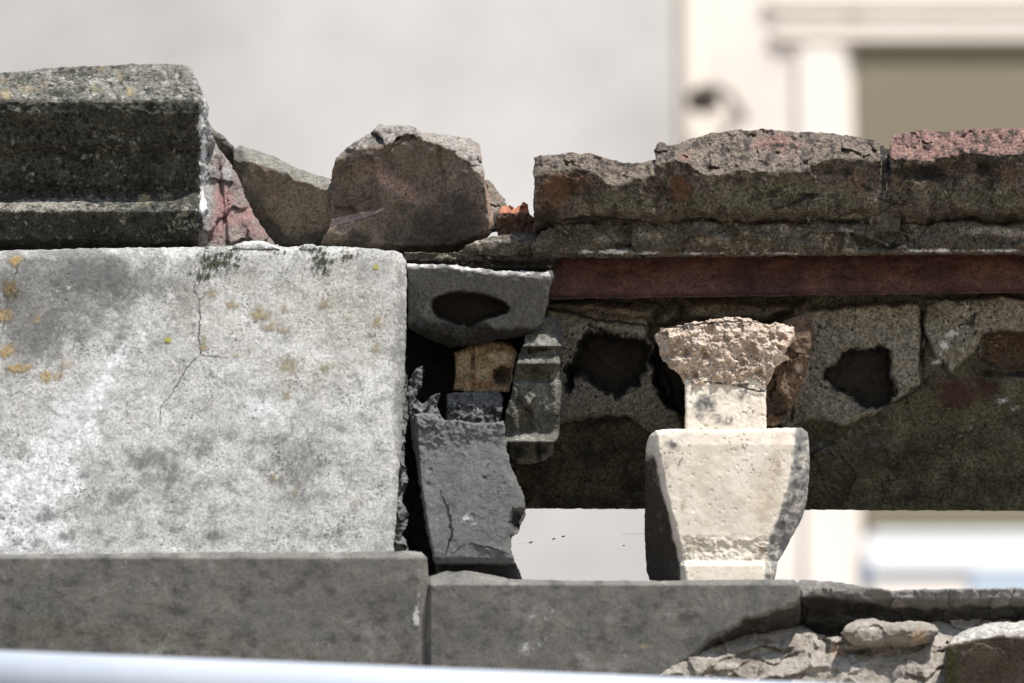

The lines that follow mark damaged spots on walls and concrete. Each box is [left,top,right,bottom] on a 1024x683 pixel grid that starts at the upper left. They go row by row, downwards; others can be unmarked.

crack [159,280,219,425]
crack [701,380,765,393]
crack [441,491,508,554]